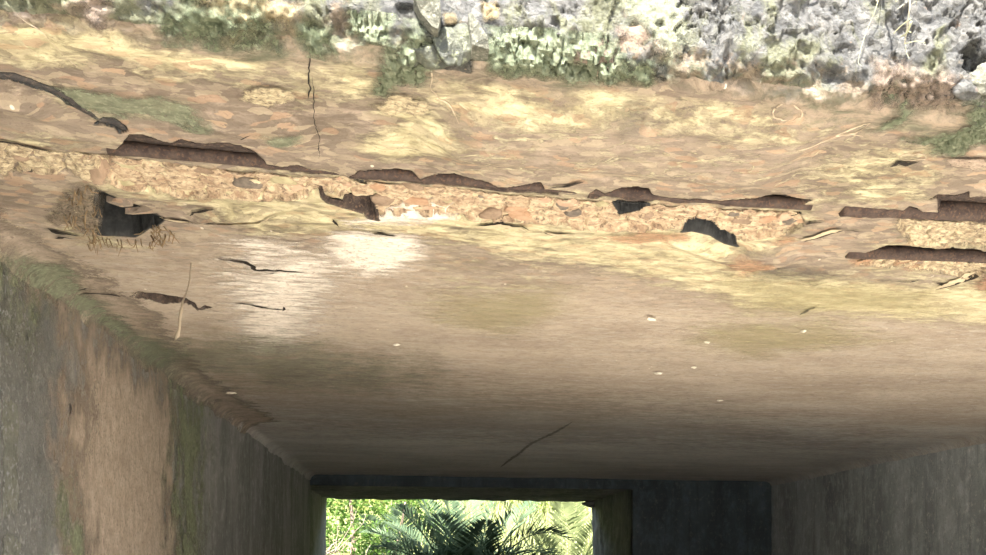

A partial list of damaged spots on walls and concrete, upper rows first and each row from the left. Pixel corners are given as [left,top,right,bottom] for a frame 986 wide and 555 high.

spalling [0,72,77,109]
spalling [0,117,812,242]
corrosion [88,141,813,211]
peeling [947,159,986,170]
crack [160,209,276,225]
corrosion [838,201,986,222]
spalling [856,191,986,280]
crack [218,258,302,274]
leakage [207,202,456,355]
corrosion [845,246,986,291]
crack [236,303,286,311]
leakage [0,207,278,555]